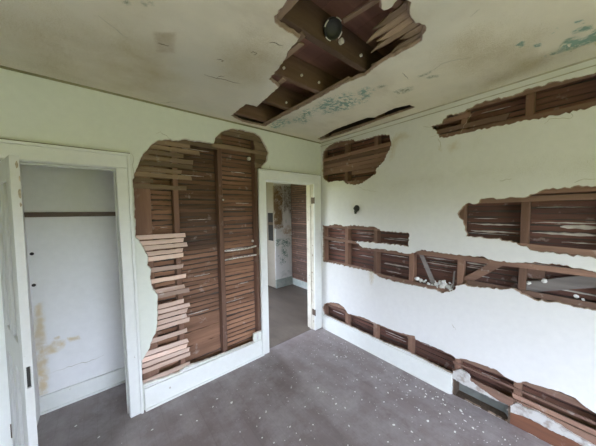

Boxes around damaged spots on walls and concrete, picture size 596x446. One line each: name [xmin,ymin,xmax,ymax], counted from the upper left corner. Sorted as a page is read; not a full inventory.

flaking render [231,0,427,129]
flaking render [318,106,414,185]
flaking render [432,72,596,138]
flaking render [132,128,269,388]
flaking render [323,224,596,311]
flaking render [457,185,596,259]
flaking render [323,302,596,446]